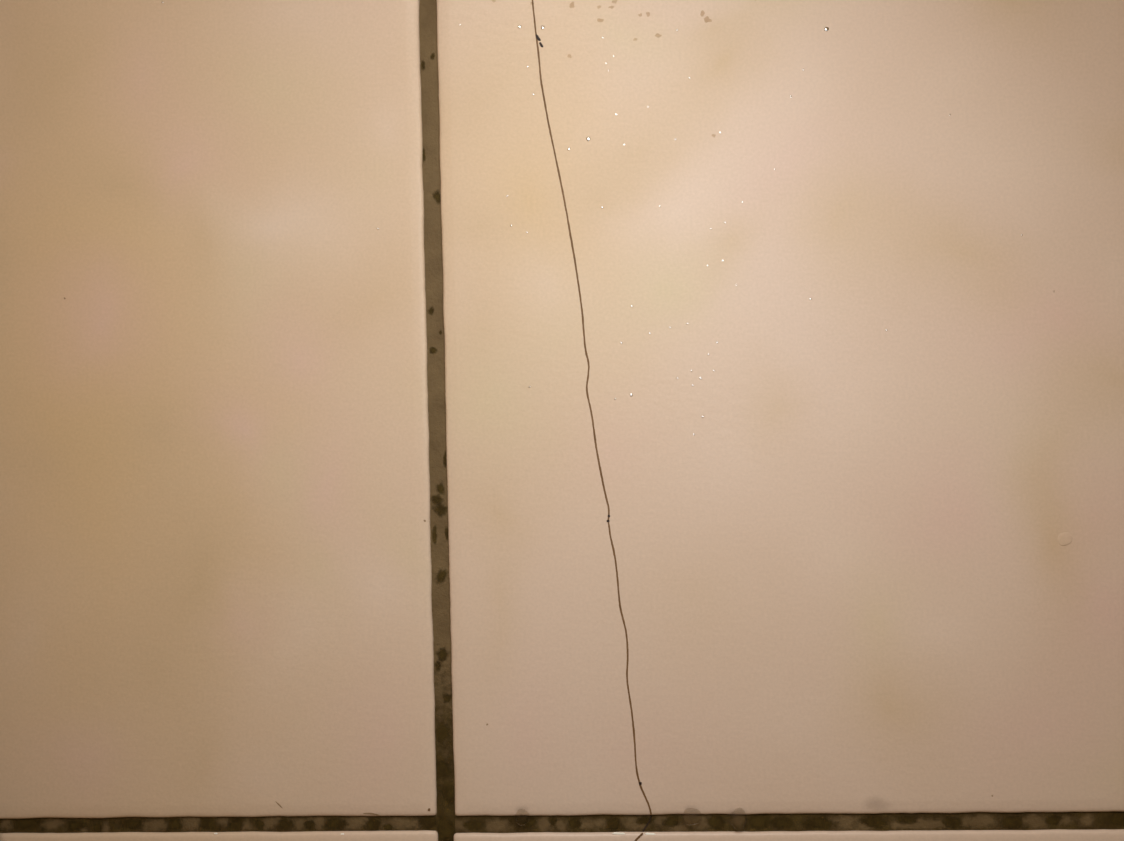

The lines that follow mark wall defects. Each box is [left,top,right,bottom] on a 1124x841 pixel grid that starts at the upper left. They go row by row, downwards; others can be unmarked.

crack [532,0,652,841]
water stain [435,649,447,670]
water stain [0,695,1124,841]